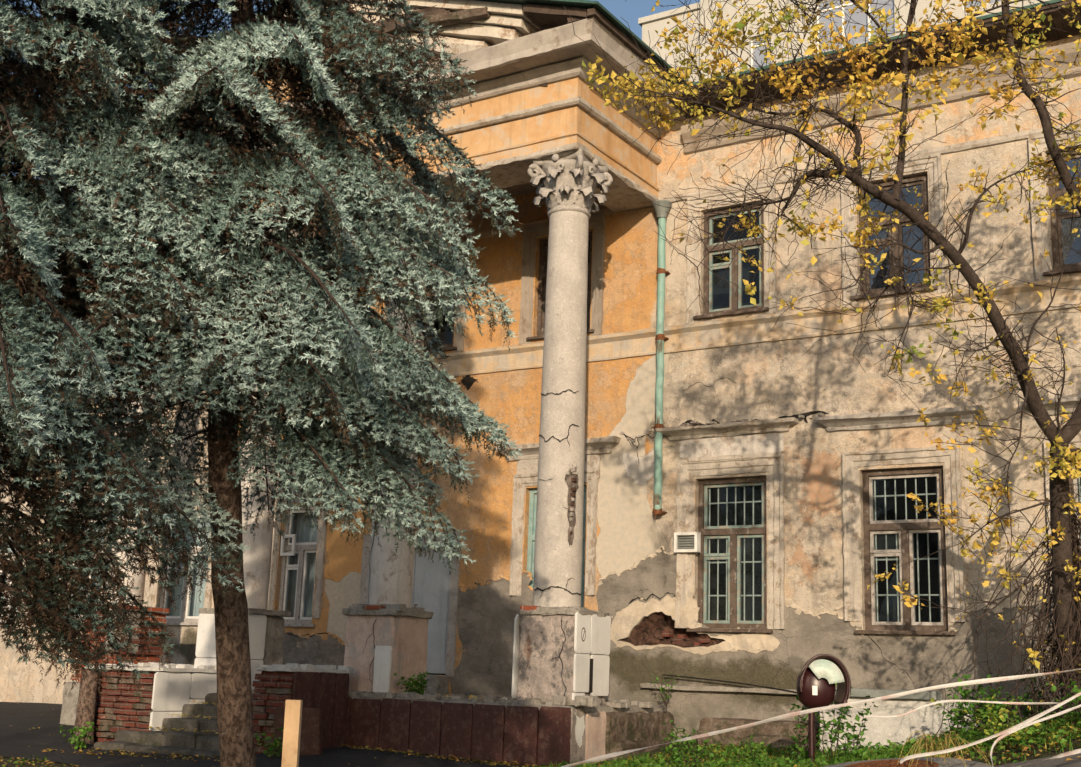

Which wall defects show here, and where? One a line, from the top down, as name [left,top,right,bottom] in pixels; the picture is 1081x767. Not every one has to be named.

crack [539,424,578,446]
peeling [282,431,368,670]
crack [534,578,582,597]
peeling [596,353,1061,741]
crack [551,619,567,696]